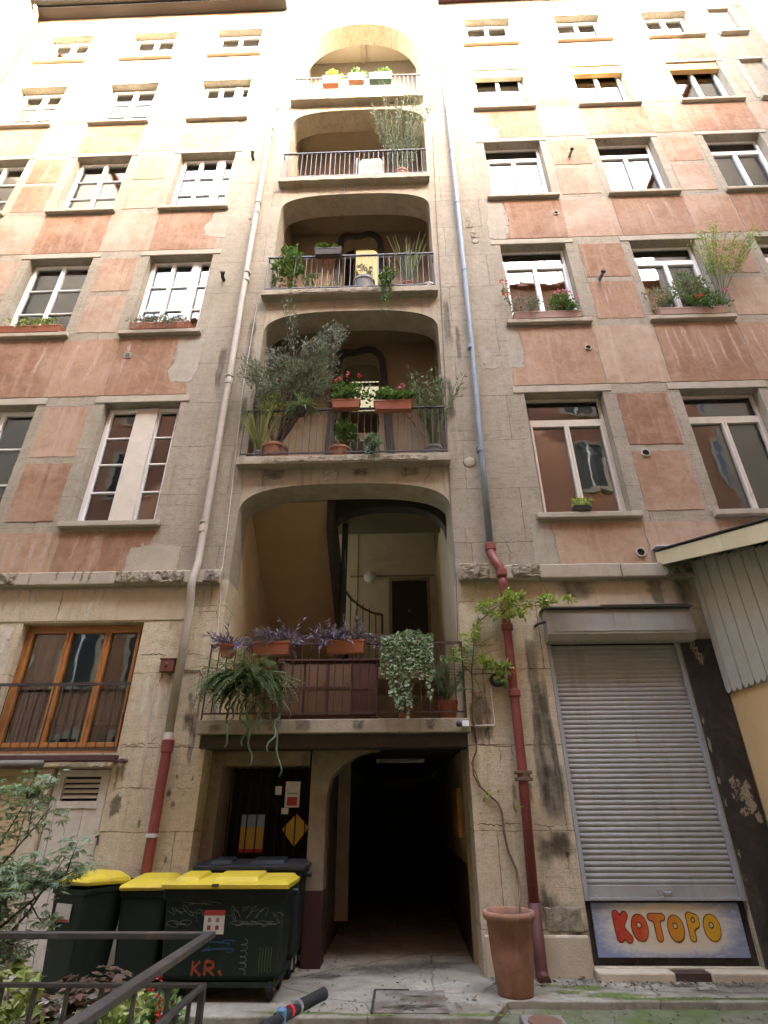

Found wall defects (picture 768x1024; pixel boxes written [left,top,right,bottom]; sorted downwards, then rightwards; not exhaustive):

flaking render [465,202,510,239]
flaking render [168,337,205,382]
water stain [528,656,554,776]
crack [473,744,557,760]
peeling [717,775,763,823]
crack [477,822,567,833]